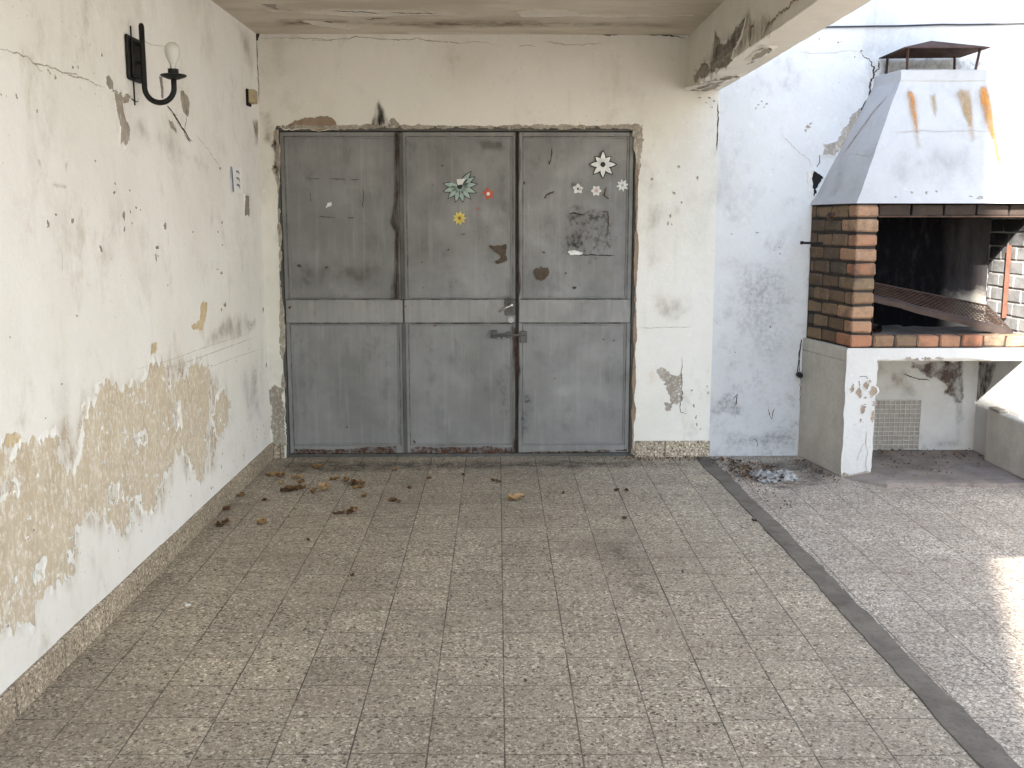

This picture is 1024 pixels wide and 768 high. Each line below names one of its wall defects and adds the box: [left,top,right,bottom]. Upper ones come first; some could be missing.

crack [1,49,99,86]
flaking render [105,75,137,150]
flaking render [169,86,190,133]
crack [168,107,220,166]
spalling [681,14,778,149]
crack [783,50,887,167]
rust [981,87,999,162]
flaking render [273,115,702,454]
flaking render [253,374,287,446]
rust [295,446,396,454]
rust [411,425,627,454]
peeling [0,342,244,641]